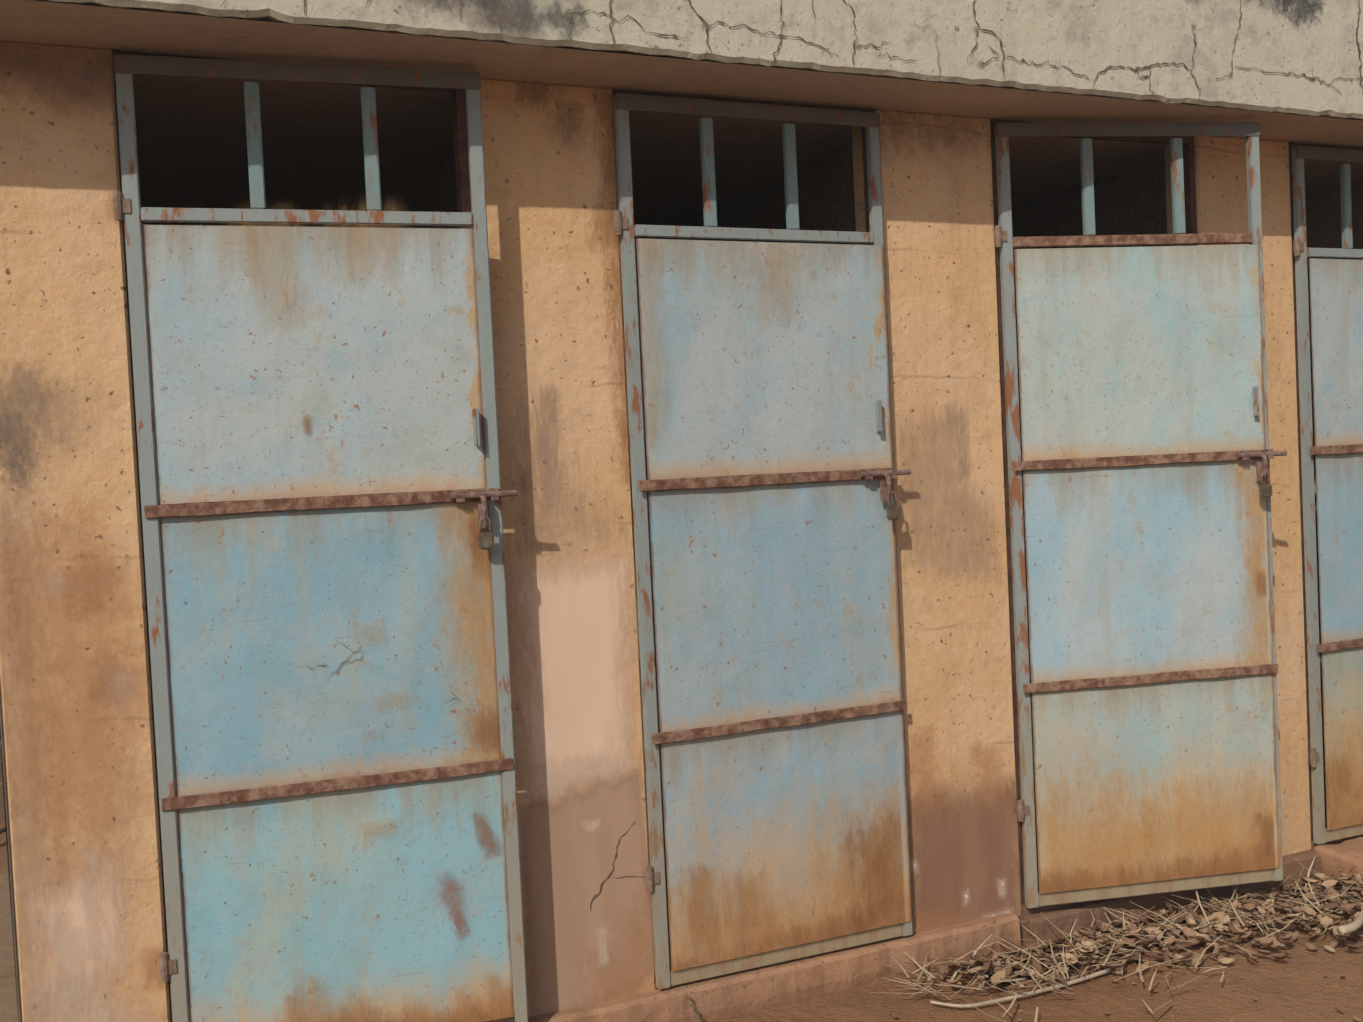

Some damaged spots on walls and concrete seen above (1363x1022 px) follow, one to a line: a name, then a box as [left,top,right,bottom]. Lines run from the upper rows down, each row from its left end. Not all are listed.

damp [470,0,585,31]
crack [566,0,1363,98]
damp [1261,0,1321,23]
damp [0,728,18,1011]
crack [590,822,645,911]
rust [1040,822,1275,893]
damp [31,849,124,1009]